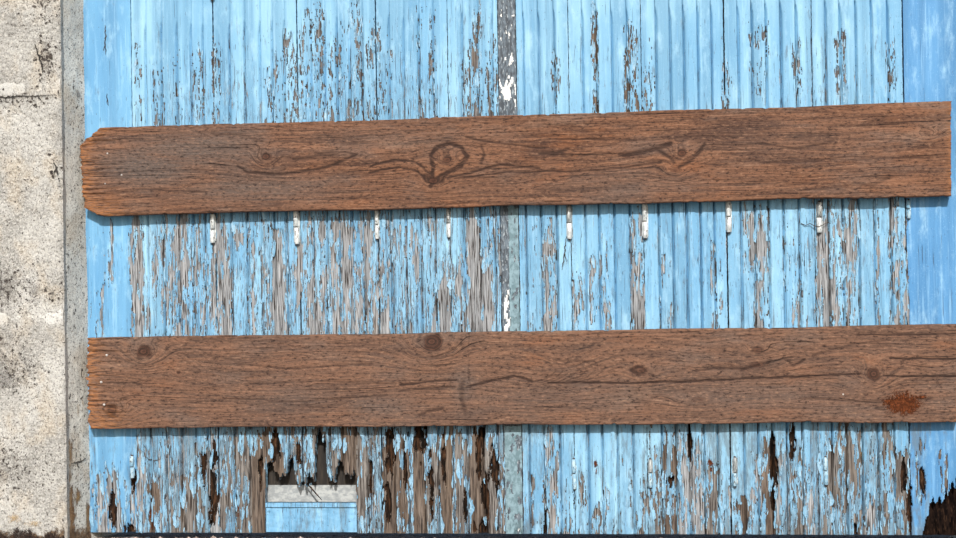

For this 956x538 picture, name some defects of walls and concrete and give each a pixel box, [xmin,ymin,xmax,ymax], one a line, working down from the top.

peeling [133,36,224,126]
peeling [590,0,599,113]
peeling [623,16,655,112]
peeling [834,28,849,104]
peeling [128,205,558,337]
peeling [572,233,612,331]
peeling [629,204,646,330]
peeling [742,201,770,328]
peeling [783,198,862,328]
peeling [873,197,910,325]
rust [882,389,926,417]
peeling [89,422,926,535]